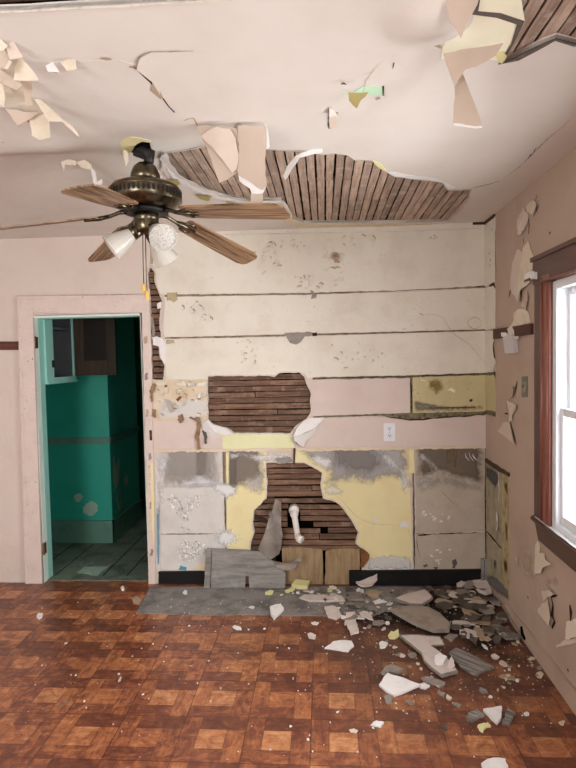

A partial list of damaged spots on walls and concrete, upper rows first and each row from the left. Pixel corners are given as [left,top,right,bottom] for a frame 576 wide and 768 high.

flaking render [472,0,576,65]
peeling [0,58,45,113]
crack [129,51,198,126]
peeling [328,108,338,129]
peeling [340,86,386,108]
flaking render [160,146,251,201]
flaking render [263,149,471,286]
peeling [144,268,370,596]